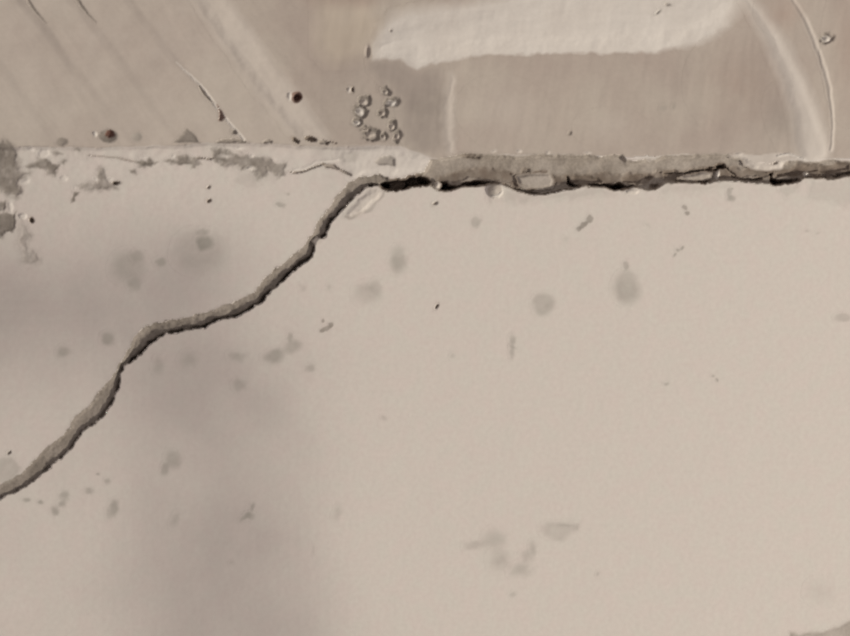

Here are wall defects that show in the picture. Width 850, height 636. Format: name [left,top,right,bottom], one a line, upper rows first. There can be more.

peeling [0,135,121,271]
crack [86,153,138,164]
peeling [128,102,290,190]
crack [0,157,850,502]